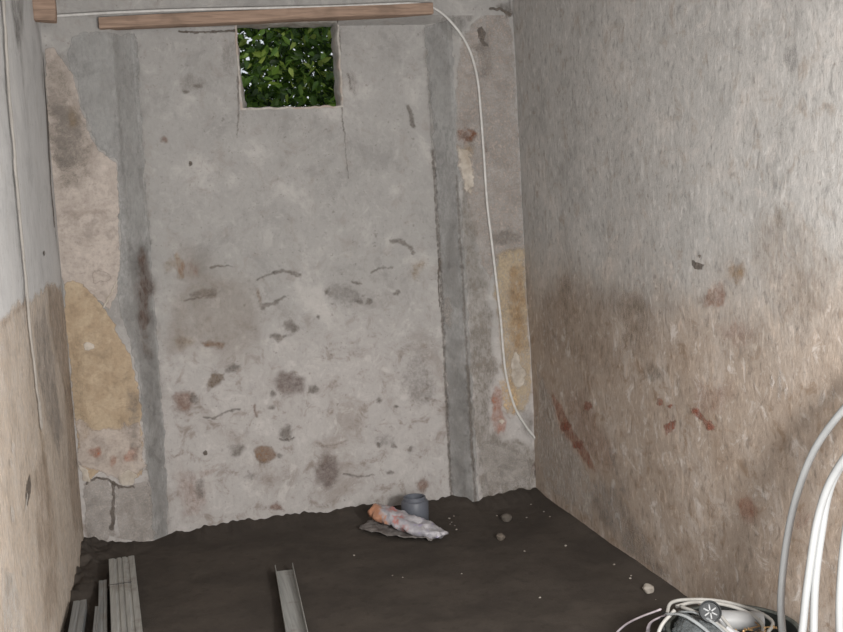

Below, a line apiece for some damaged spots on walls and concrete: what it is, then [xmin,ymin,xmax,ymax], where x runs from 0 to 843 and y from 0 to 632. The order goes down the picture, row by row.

leakage [0,284,84,632]
spalling [45,47,146,486]